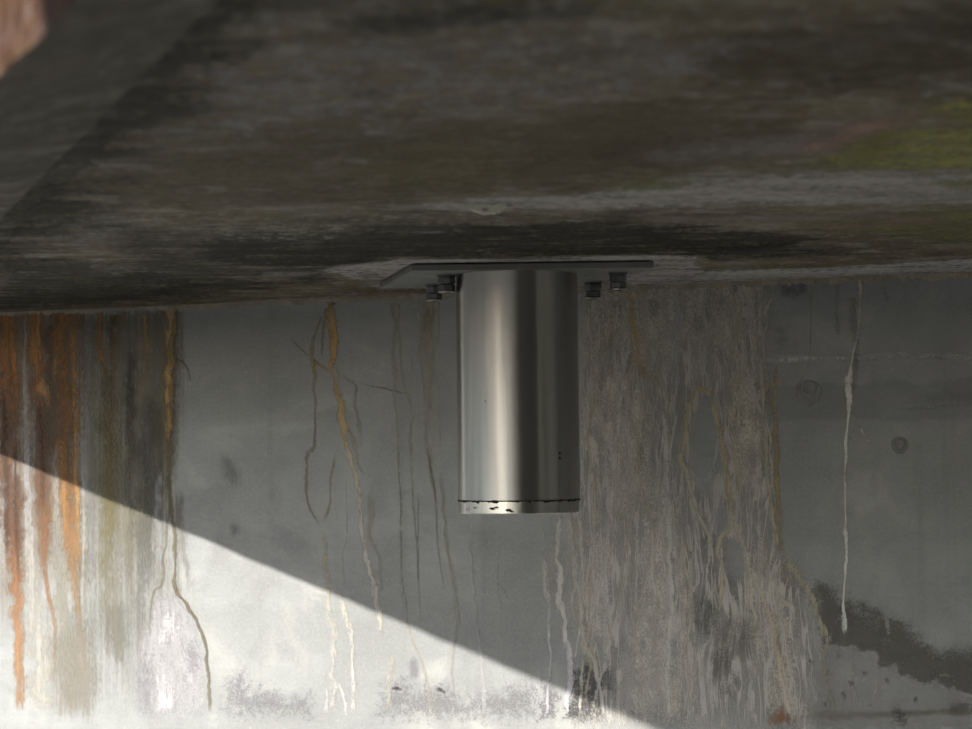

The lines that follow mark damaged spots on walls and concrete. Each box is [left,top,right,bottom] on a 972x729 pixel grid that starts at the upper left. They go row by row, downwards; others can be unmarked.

corrosion [0,312,83,707]
water stain [0,193,972,729]